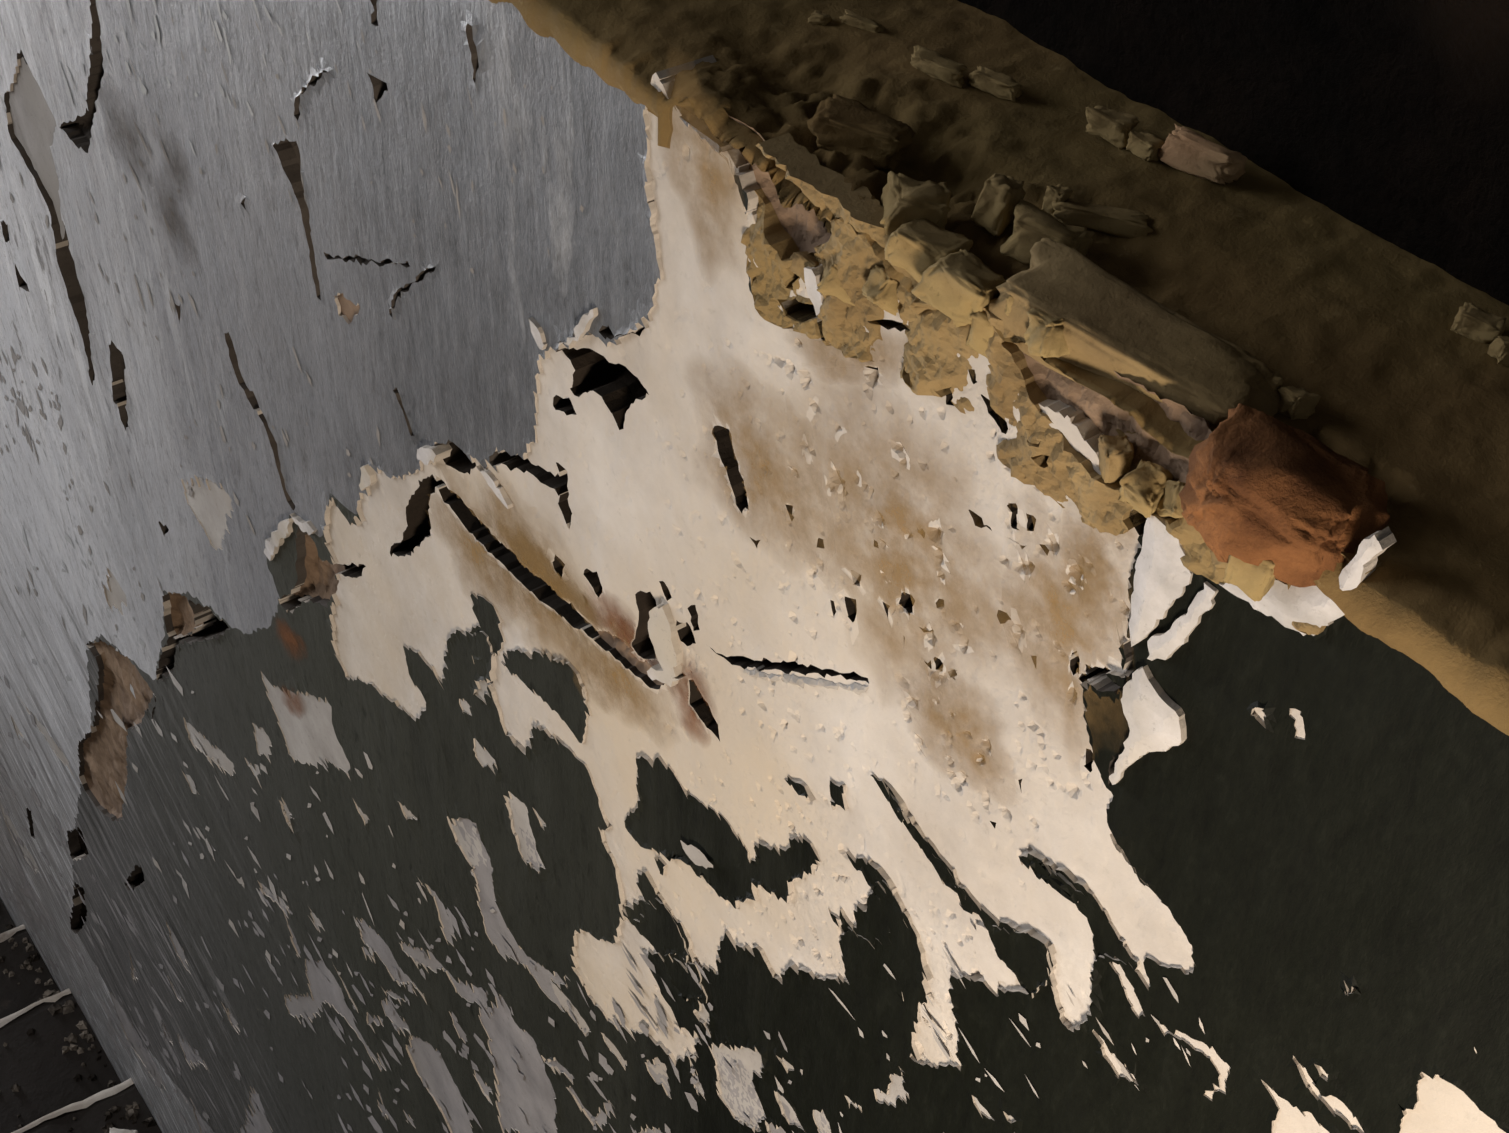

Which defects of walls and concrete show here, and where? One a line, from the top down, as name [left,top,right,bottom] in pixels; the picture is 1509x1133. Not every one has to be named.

peeling [9,57,85,299]
crack [338,256,435,290]
crack [293,534,350,599]
crack [413,479,445,545]
leakage [741,428,790,509]
flaking render [152,55,1397,1133]
leakage [843,465,968,623]
leakage [1033,547,1109,695]
crack [78,641,153,855]
peeling [98,673,373,838]
peeling [0,710,270,1133]
peeling [1400,1072,1506,1133]